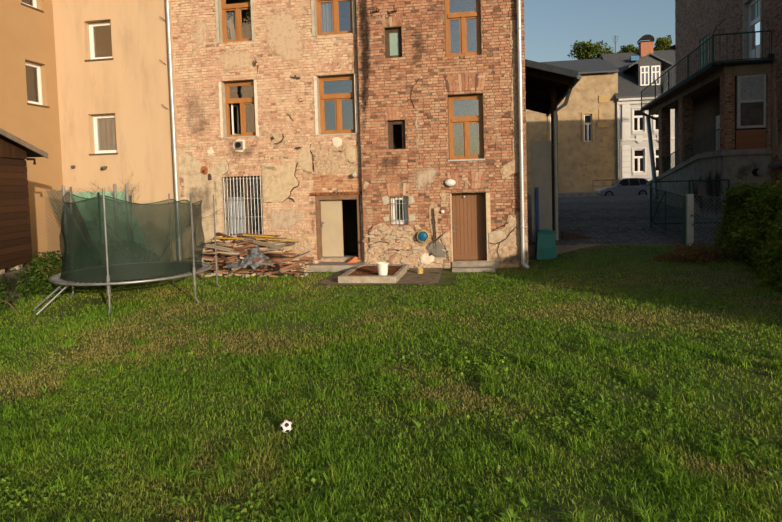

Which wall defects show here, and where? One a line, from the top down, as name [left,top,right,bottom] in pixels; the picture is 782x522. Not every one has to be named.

peeling [261,143,369,203]
spalling [338,215,451,283]
peeling [488,213,528,267]